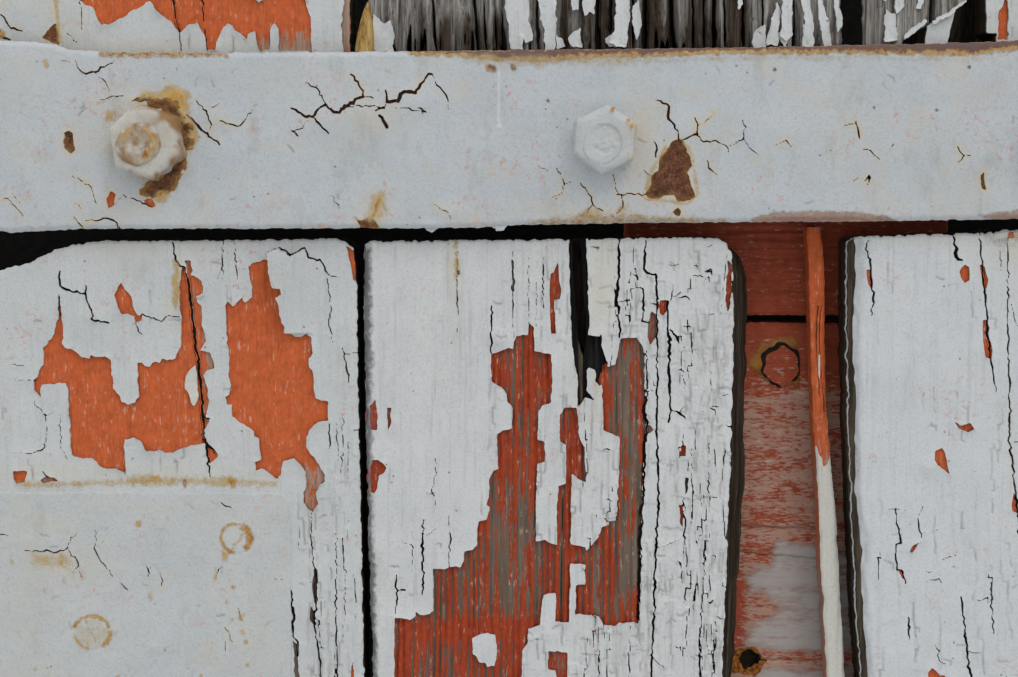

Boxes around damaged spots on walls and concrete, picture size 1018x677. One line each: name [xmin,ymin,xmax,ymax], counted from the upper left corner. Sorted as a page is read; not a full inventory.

peeling [81,0,312,52]
peeling [505,0,583,50]
corrosion [133,86,199,202]
corrosion [544,208,643,225]
corrosion [645,139,698,223]
crack [571,238,586,354]
peeling [34,260,218,473]
peeling [226,260,328,513]
crack [953,229,1018,533]
peeling [394,300,667,677]
crack [614,237,711,677]
crack [935,596,974,677]